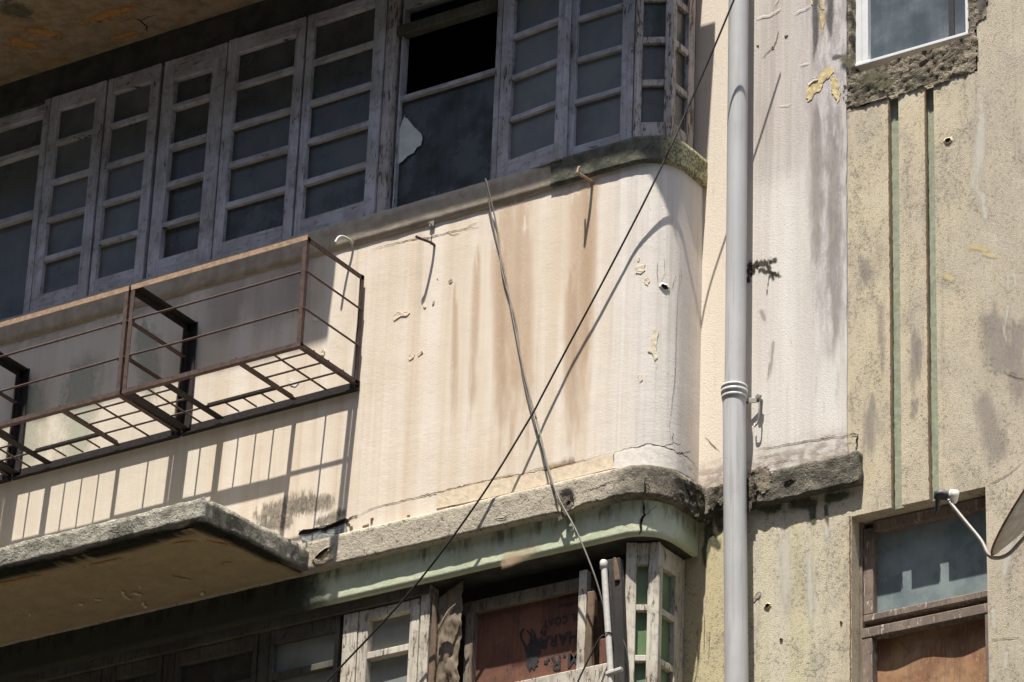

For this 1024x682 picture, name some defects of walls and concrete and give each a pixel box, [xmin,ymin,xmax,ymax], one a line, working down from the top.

peeling [636,258,668,290]
damp [746,258,781,294]
spalling [806,0,988,503]
crack [348,261,718,535]
damp [254,492,345,529]
spalling [747,466,772,514]